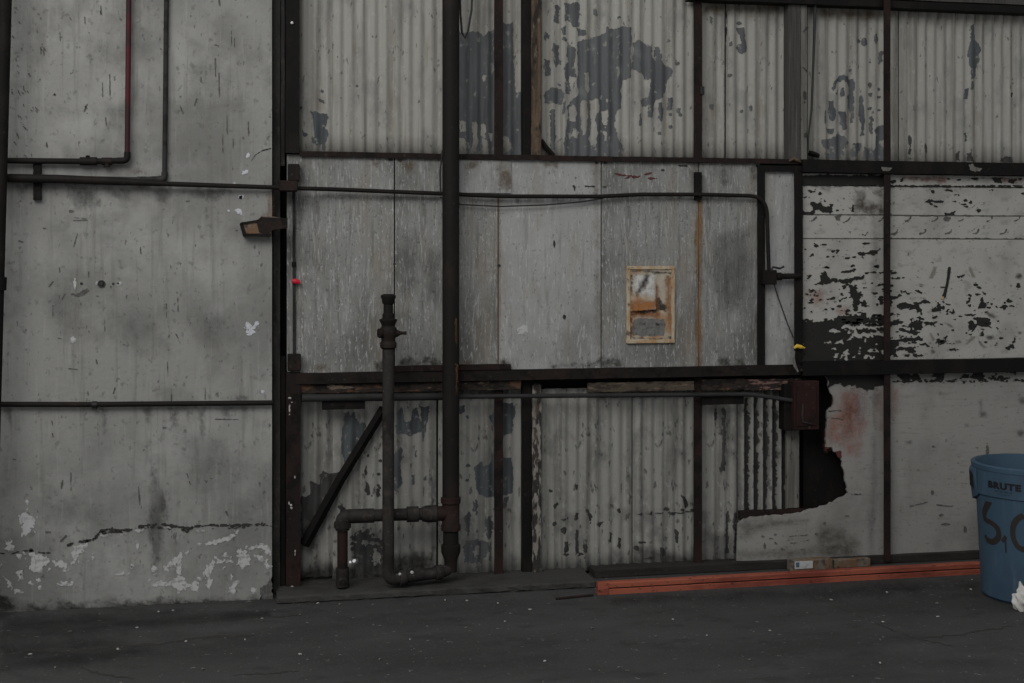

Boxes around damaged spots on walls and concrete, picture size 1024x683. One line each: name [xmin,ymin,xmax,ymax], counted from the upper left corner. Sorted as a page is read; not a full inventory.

peeling [459,22,521,155]
peeling [544,2,682,164]
peeling [964,24,981,99]
peeling [803,69,1024,361]
spalling [0,500,96,594]
crack [0,522,272,554]
spalling [146,529,273,599]
peeling [350,527,382,577]
peeling [364,406,429,497]
peeling [462,452,514,564]
peeling [714,408,727,472]
peeling [725,398,785,554]